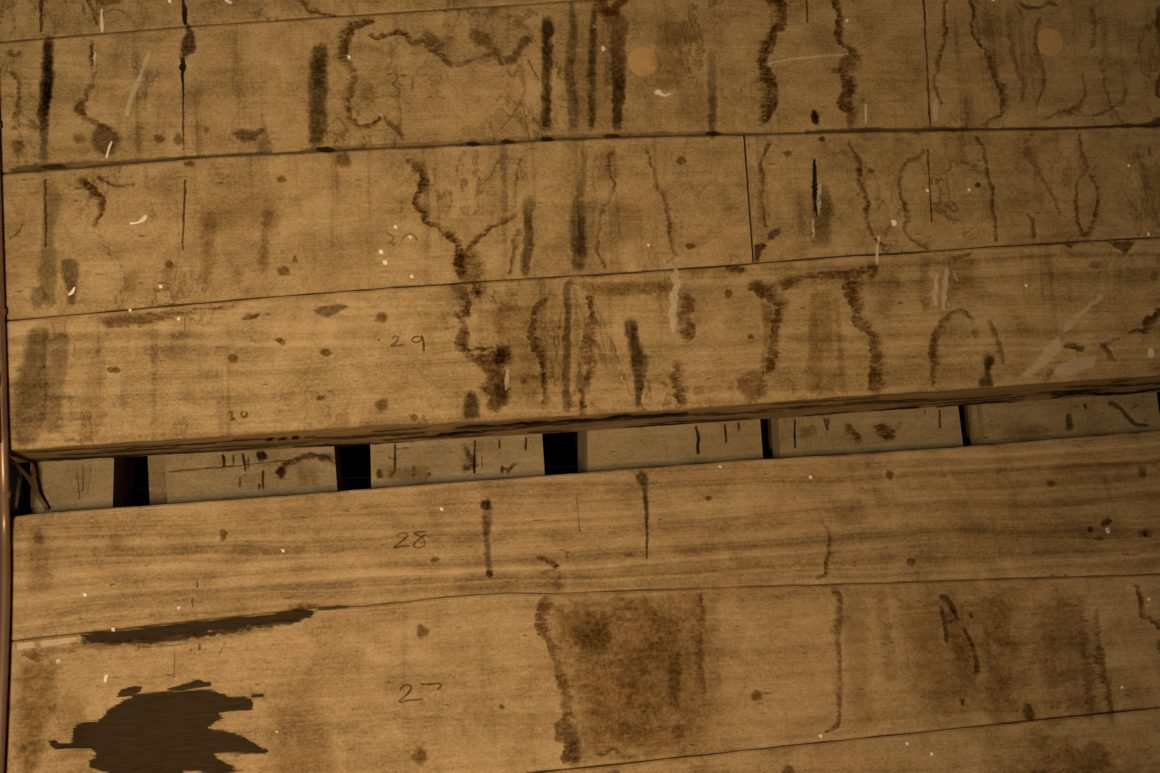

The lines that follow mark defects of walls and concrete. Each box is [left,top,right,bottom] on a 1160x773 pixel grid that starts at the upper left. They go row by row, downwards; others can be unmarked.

leakage [38,0,53,141]
leakage [515,22,553,128]
leakage [588,0,628,84]
leakage [610,30,625,126]
leakage [755,230,778,261]
leakage [527,321,545,400]
leakage [626,322,646,405]
leakage [670,294,695,339]
leakage [749,267,883,391]
leakage [980,356,994,386]
leakage [1129,308,1160,333]